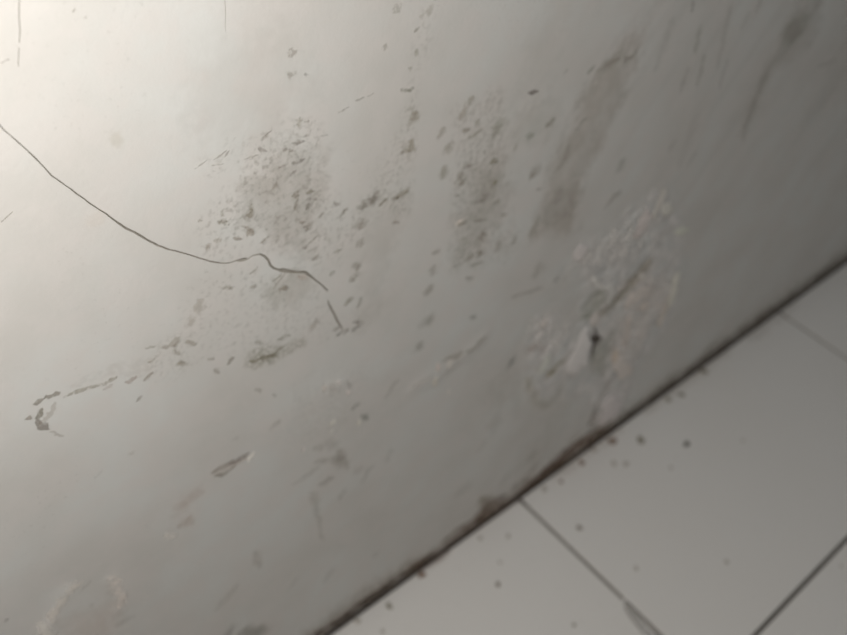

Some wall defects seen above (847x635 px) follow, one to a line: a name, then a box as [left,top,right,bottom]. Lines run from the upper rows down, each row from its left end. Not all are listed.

crack [0,125,343,330]